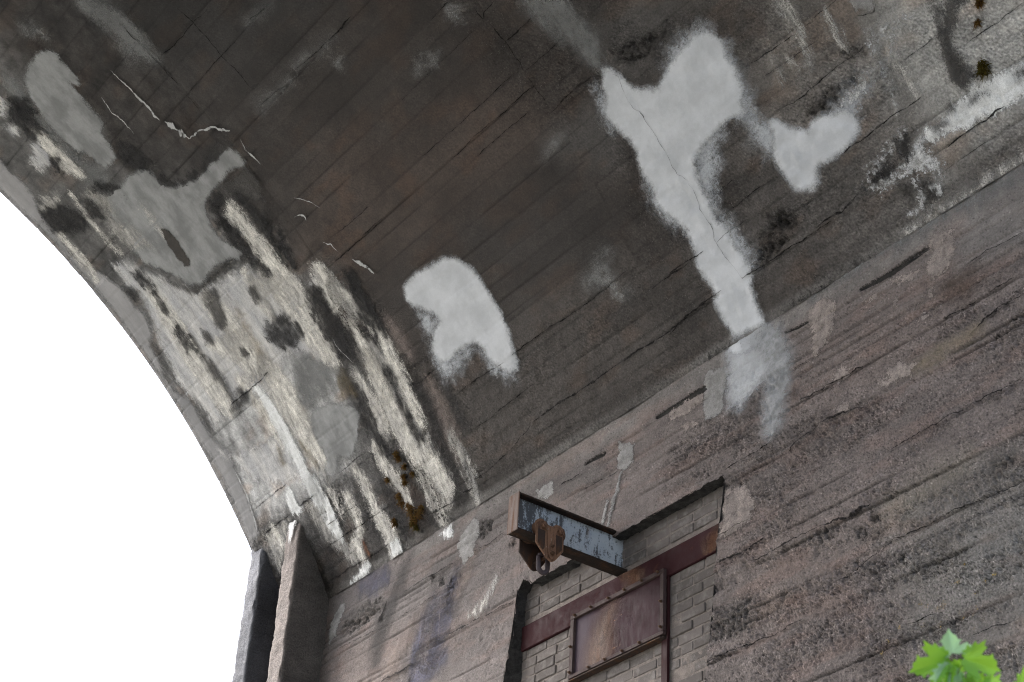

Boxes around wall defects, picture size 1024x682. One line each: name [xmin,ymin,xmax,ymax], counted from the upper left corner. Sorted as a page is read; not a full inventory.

crack [101,7,350,160]
damp [770,0,814,84]
damp [821,7,847,53]
damp [862,62,1024,246]
damp [167,199,481,682]
rust [588,619,617,666]